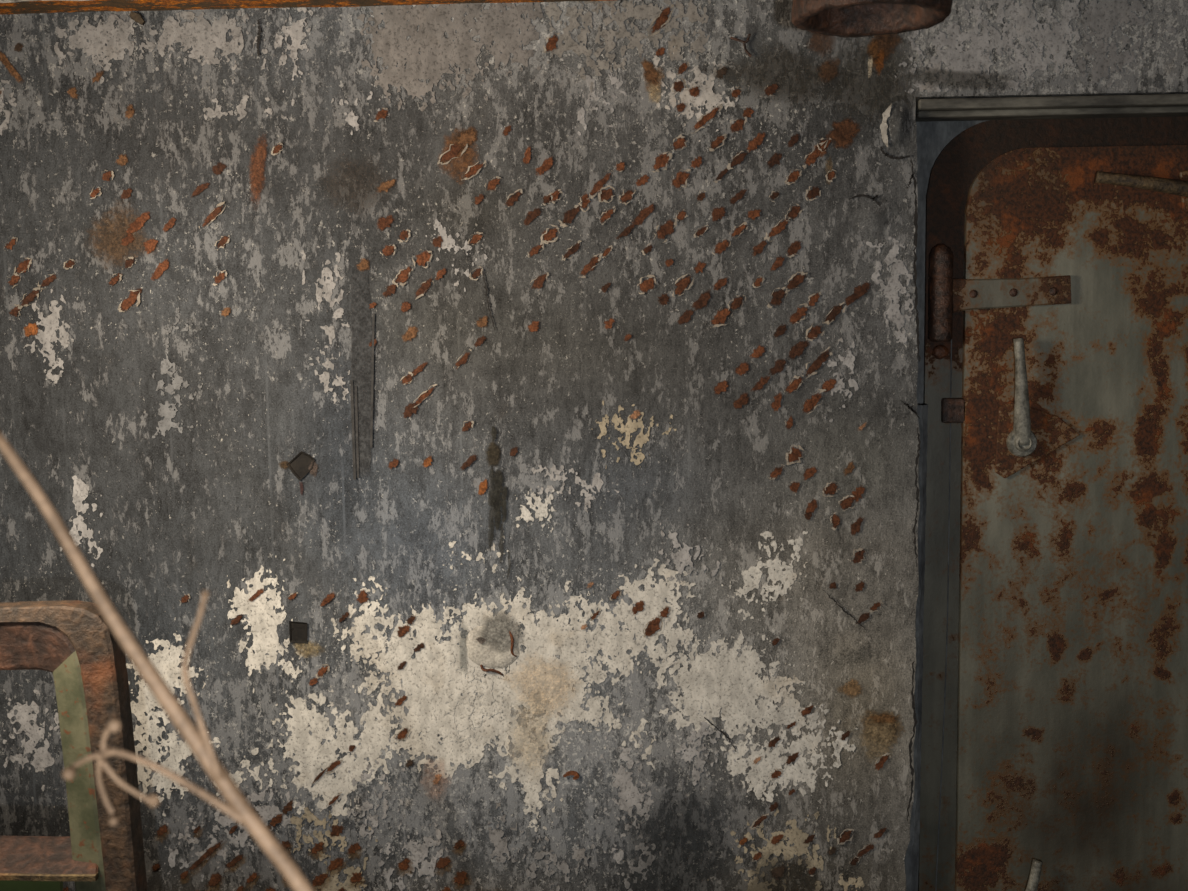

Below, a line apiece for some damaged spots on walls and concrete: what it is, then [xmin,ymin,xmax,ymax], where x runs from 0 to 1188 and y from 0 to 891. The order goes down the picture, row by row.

peeling [895,0,1092,94]
leakage [486,426,511,578]